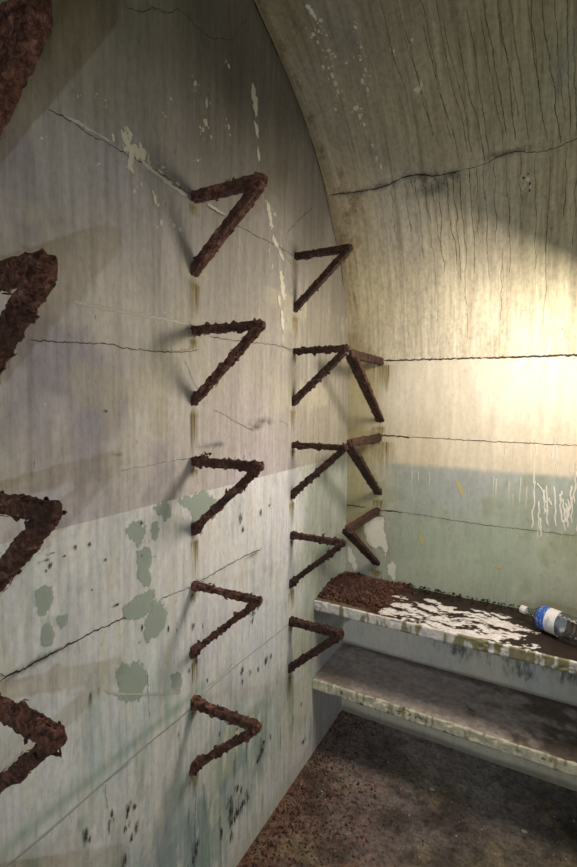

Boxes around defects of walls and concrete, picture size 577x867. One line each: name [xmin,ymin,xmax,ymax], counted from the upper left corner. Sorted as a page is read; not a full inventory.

crack [129,0,577,244]
crack [50,110,307,262]
crack [384,353,577,361]
water stain [508,441,577,538]
peeling [123,490,217,643]
crack [160,548,262,600]
peeling [363,516,396,581]
peeling [36,585,68,647]
crack [0,617,126,682]
peeling [116,660,148,703]
peeling [170,672,182,694]
water stain [221,785,250,842]